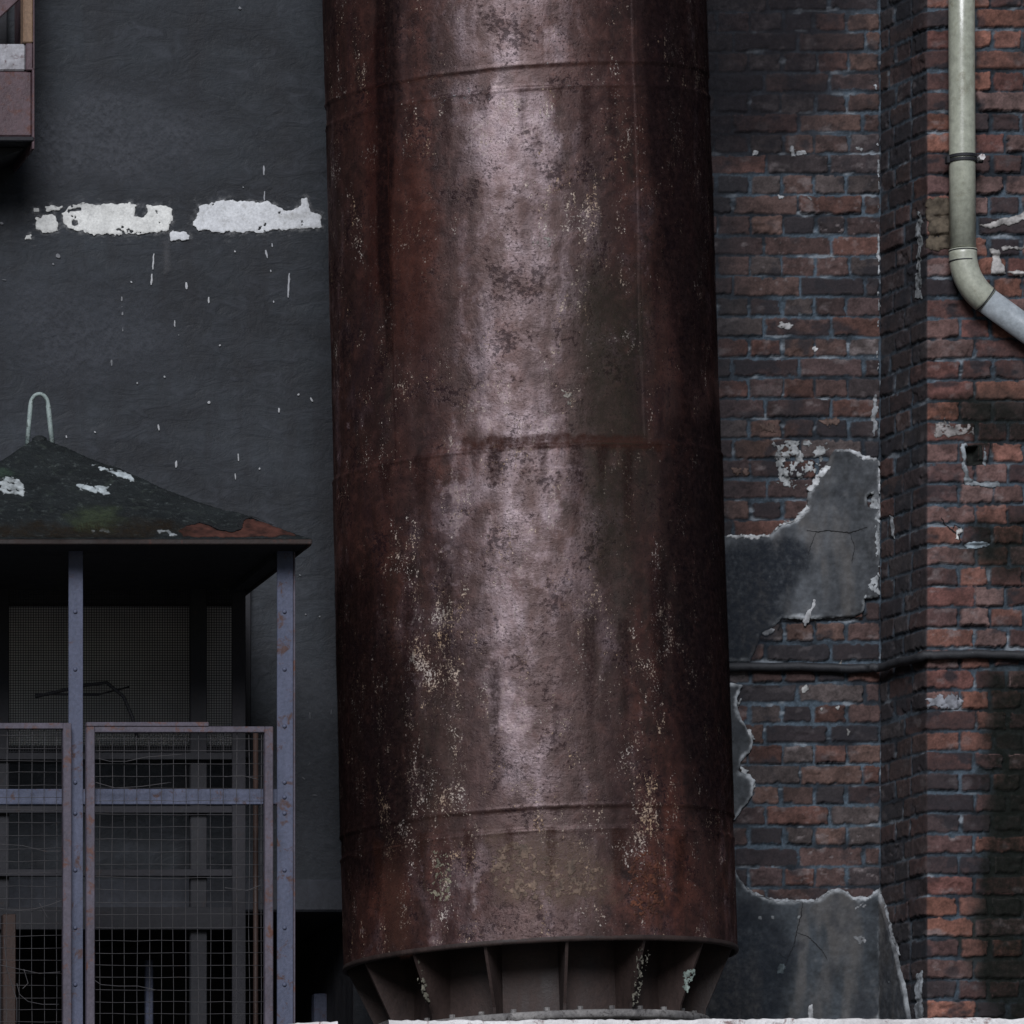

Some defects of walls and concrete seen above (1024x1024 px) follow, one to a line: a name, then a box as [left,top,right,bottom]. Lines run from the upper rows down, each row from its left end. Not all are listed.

peeling [25,198,322,241]
rust [463,434,661,463]
flaking render [806,465,830,492]
flaking render [836,448,880,517]
rust [178,518,296,538]
flaking render [726,505,810,540]
crack [807,527,867,560]
flaking render [741,881,880,903]